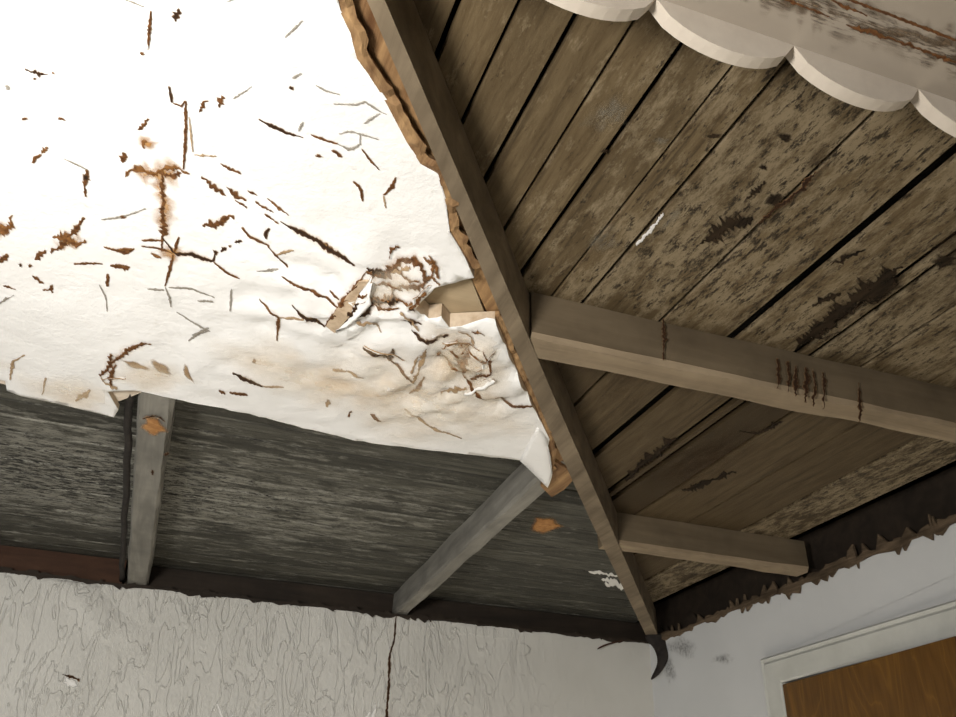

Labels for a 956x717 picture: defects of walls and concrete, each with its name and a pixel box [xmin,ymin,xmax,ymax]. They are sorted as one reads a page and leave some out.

peeling [771,0,956,65]
corrosion [0,215,15,236]
corrosion [50,217,86,254]
corrosion [125,165,189,252]
peeling [636,213,664,246]
peeling [325,246,495,401]
peeling [99,342,151,390]
spalling [533,518,561,533]
peeling [589,570,623,590]
crack [385,616,397,717]